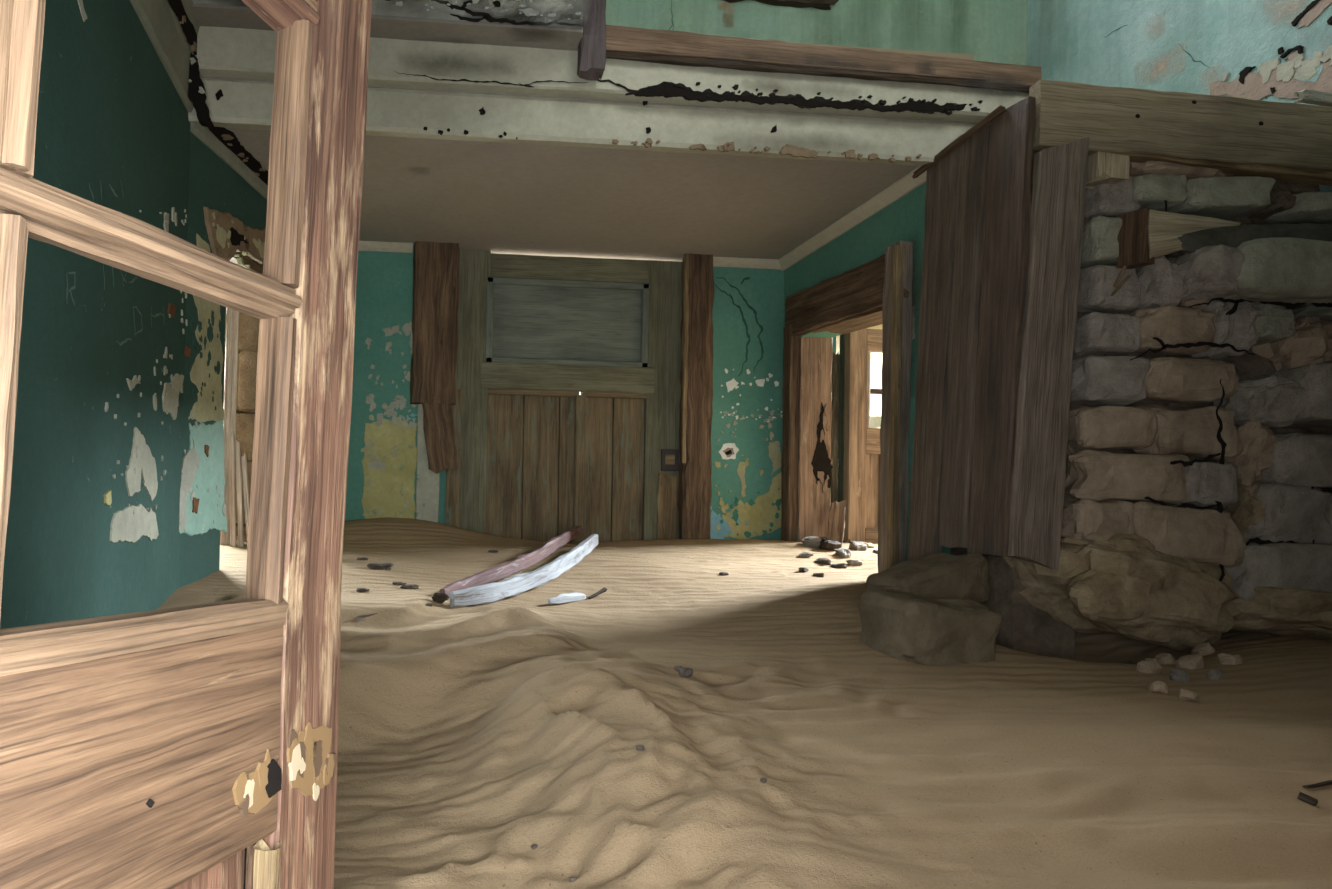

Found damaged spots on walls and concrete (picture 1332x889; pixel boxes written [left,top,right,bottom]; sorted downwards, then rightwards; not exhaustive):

crack [431,0,584,27]
spalling [1291,0,1332,29]
spalling [625,82,983,115]
flaking render [1209,45,1332,100]
flaking render [160,207,266,268]
peeling [103,291,227,543]
peeling [361,322,418,519]
peeling [710,369,782,539]